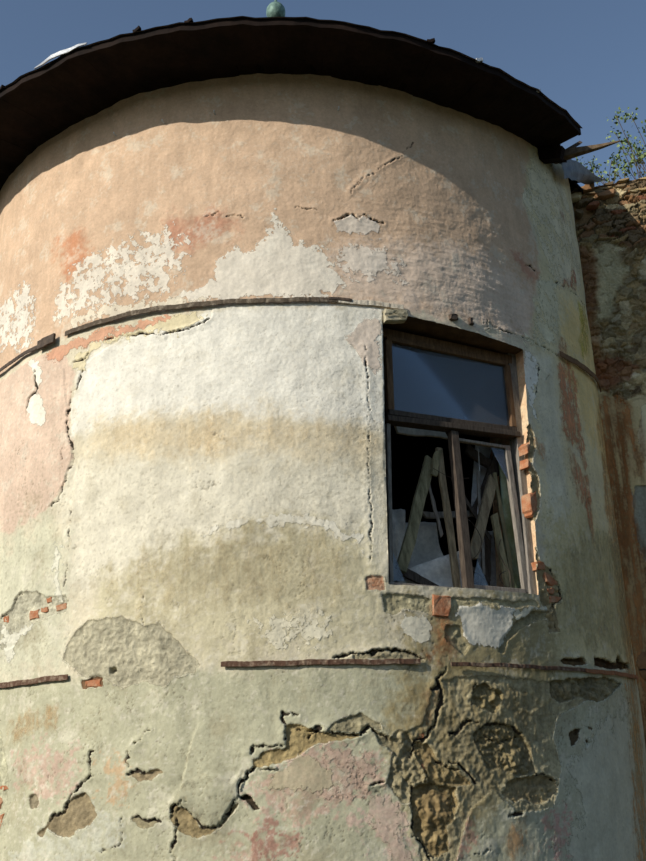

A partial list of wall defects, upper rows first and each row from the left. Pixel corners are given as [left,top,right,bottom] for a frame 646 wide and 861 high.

crack [106,318,210,340]
peeling [26,208,409,426]
crack [51,353,89,537]
spalling [518,351,541,524]
corrosion [558,363,593,536]
spalling [0,542,69,663]
crack [410,782,434,859]
spalling [252,674,646,861]
crack [435,761,476,784]
peeling [353,546,563,661]
crack [409,668,521,758]
corrosion [597,394,646,861]